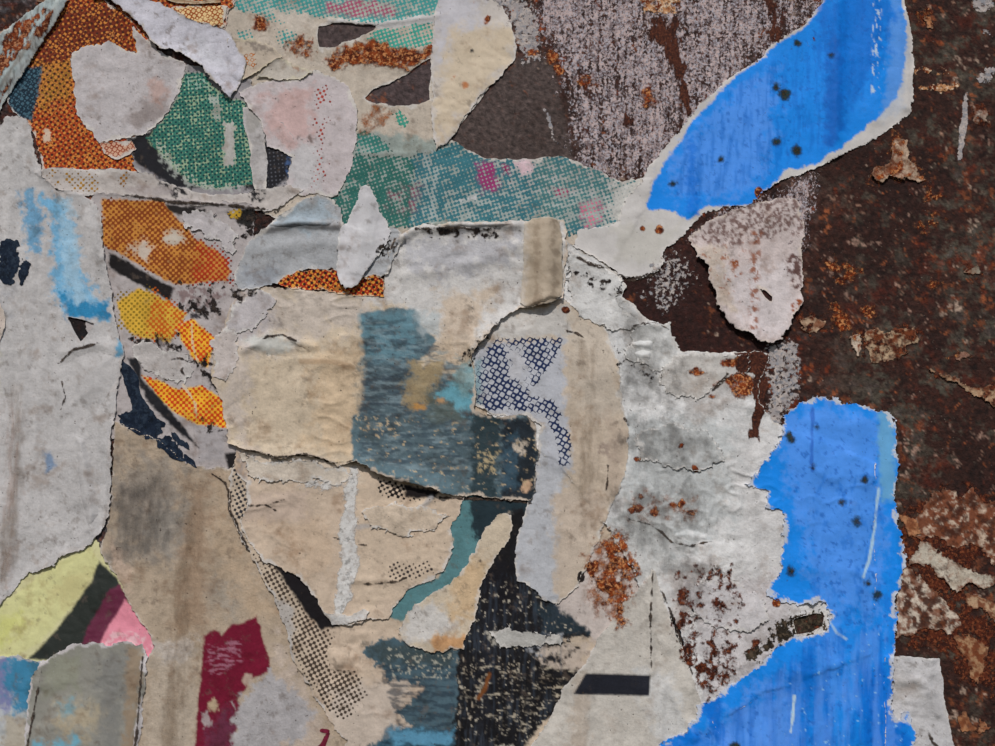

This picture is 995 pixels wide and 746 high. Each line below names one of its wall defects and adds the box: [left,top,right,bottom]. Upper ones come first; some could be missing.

rust [253,14,269,31]
rust [0,8,53,102]
rust [283,34,433,72]
peeling [496,0,823,179]
rust [914,66,960,96]
peeling [968,102,992,128]
peeling [871,133,926,183]
peeling [718,172,821,248]
peeling [796,310,826,337]
rust [830,303,850,332]
peeling [765,338,801,423]
rust [577,528,641,630]